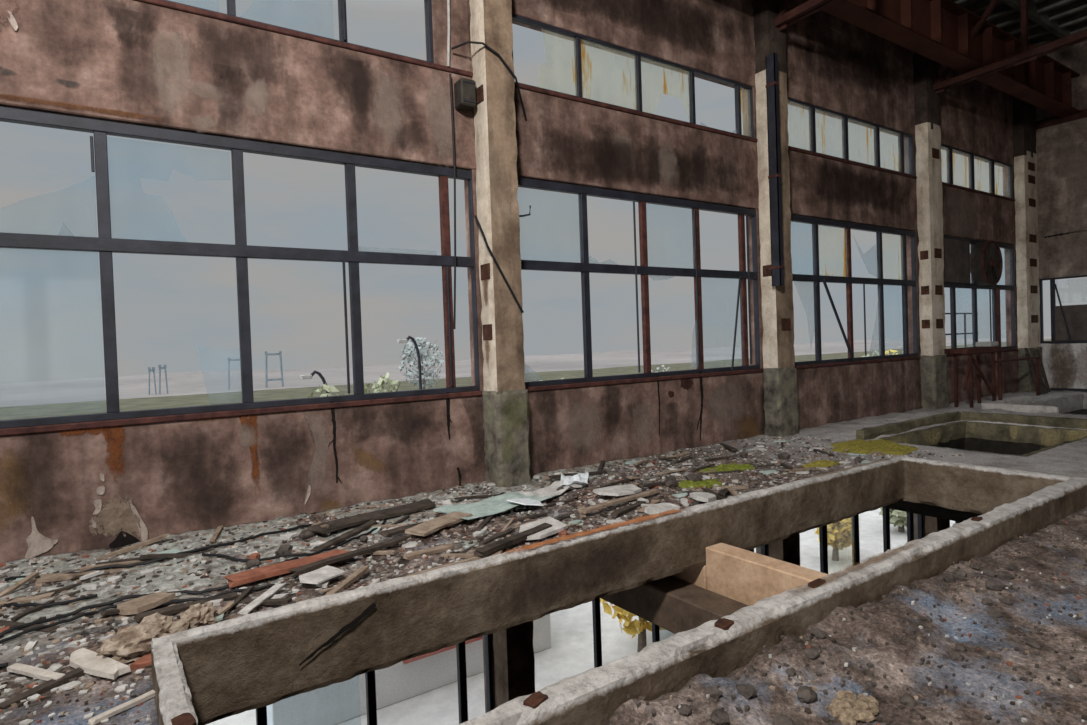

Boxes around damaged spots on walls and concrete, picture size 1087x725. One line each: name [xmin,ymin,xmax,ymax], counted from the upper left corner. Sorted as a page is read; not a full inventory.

rust [60,426,124,475]
rust [203,415,260,483]
peeling [25,517,58,559]
spalling [89,473,148,549]
crack [299,603,376,665]